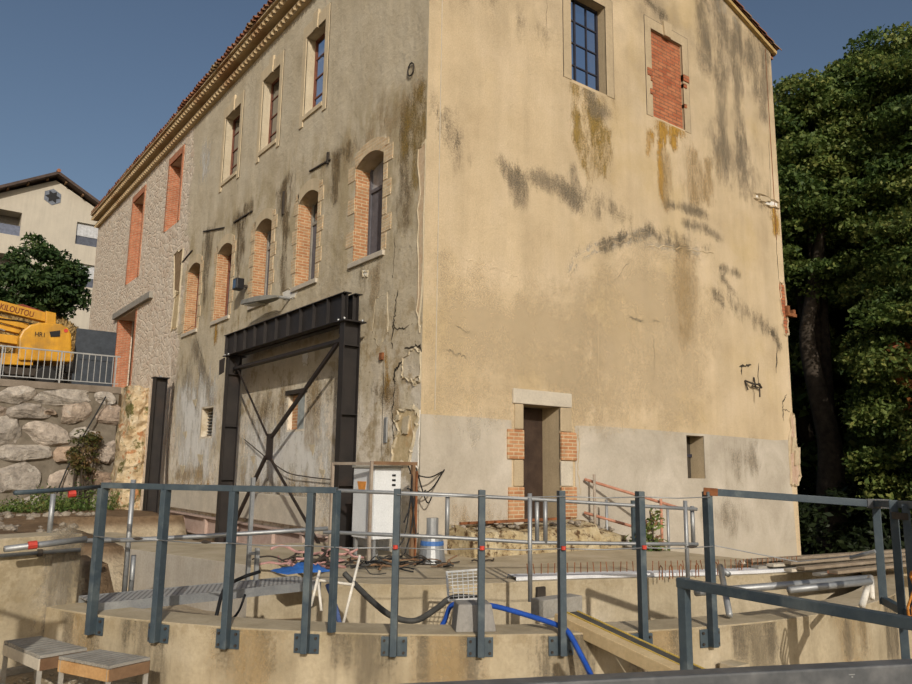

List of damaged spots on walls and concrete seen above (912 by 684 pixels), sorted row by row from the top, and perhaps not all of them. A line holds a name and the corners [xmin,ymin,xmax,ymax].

mould [400,85,427,223]
water stain [573,83,610,166]
water stain [662,70,746,235]
crack [381,237,422,455]
crack [739,353,777,383]
flaking render [779,281,790,336]
spalling [788,412,802,487]